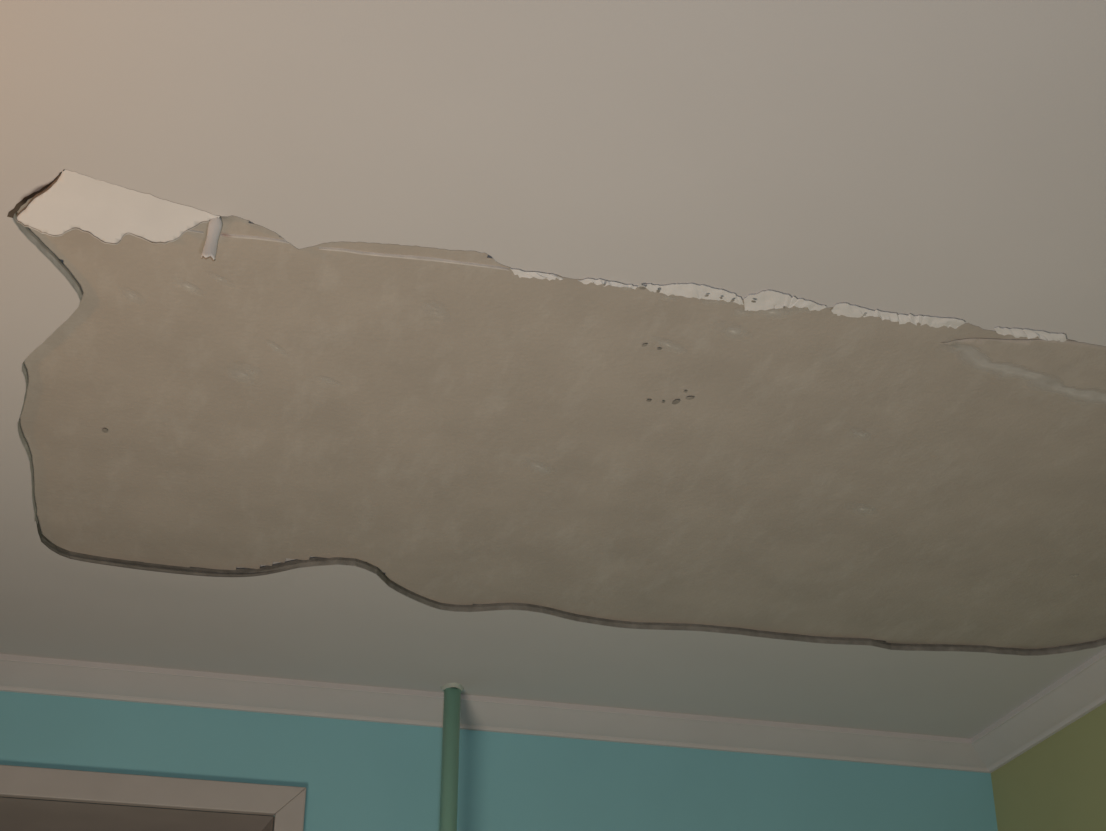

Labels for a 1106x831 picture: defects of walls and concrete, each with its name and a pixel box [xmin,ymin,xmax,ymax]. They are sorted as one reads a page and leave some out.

crack [319,247,509,271]
spalling [13,169,1106,656]